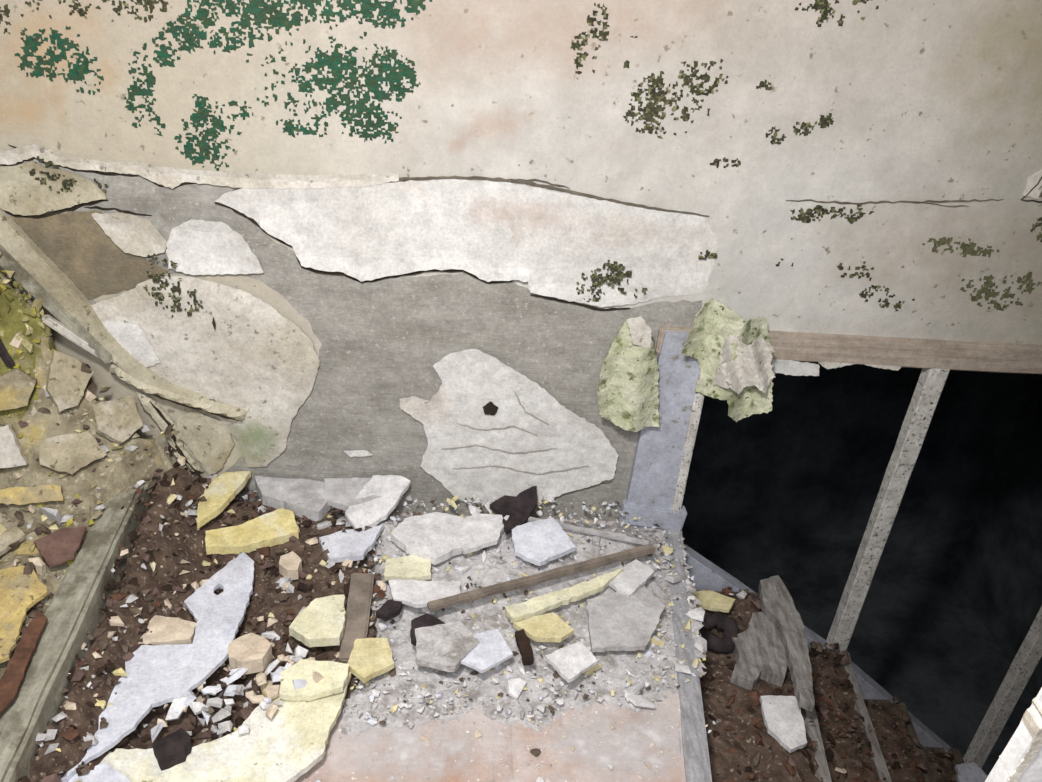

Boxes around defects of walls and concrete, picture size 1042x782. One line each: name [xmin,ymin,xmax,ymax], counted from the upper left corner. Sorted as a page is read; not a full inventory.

crack [786,177,1042,207]
flaking render [1023,170,1042,199]
peeling [1030,217,1042,242]
flaking render [0,0,902,521]
spalling [316,507,345,530]
spalling [646,546,674,575]